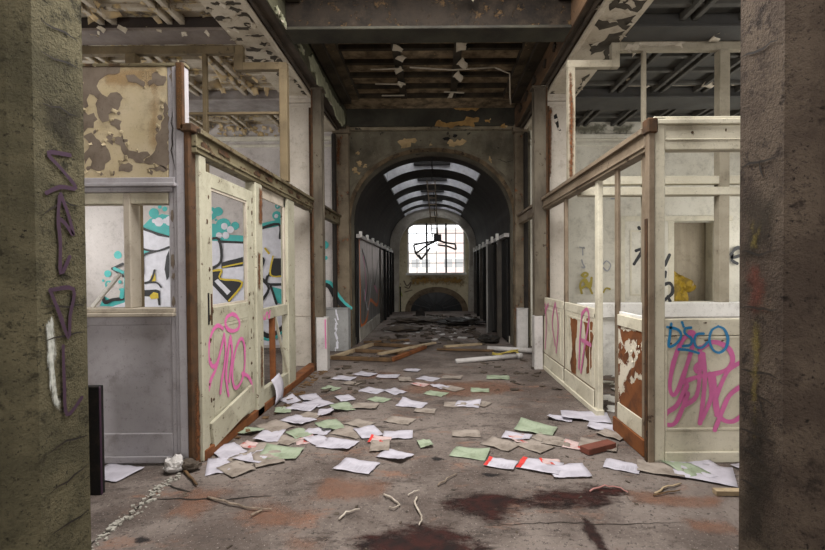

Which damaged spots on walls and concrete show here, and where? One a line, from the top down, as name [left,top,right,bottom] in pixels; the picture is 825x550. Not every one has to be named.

peeling [81,0,128,37]
peeling [202,0,283,62]
peeling [274,5,287,29]
peeling [589,0,686,60]
peeling [199,56,269,96]
peeling [289,44,345,126]
peeling [82,56,179,176]
spalling [398,138,417,148]
peeling [435,108,491,128]
peeling [570,317,594,374]
peeling [620,329,642,420]